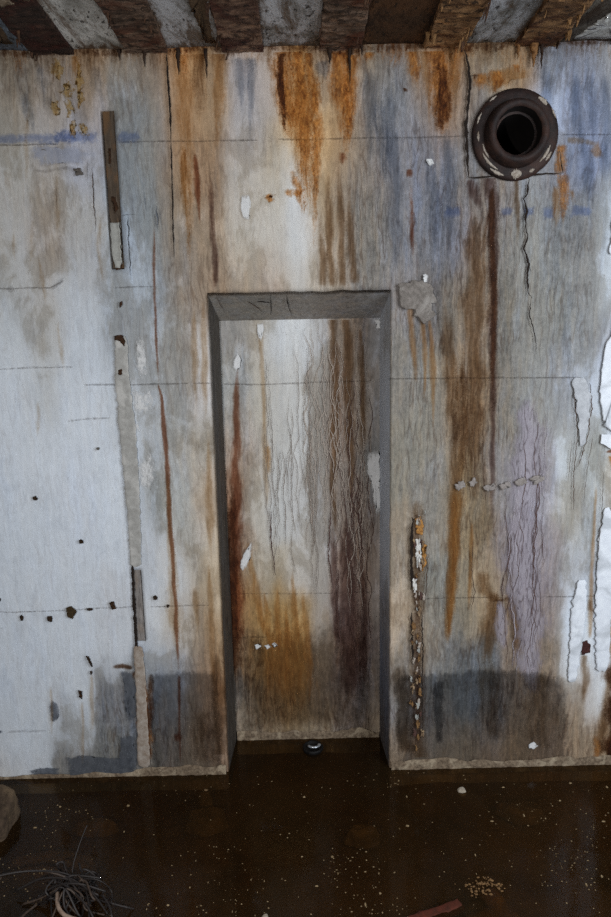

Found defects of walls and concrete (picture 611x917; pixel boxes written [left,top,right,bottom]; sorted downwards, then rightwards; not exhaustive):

corrosion [271,46,285,112]
crack [464,50,495,178]
crack [522,151,563,343]
peeling [572,337,611,472]
spalling [409,510,429,751]
peeling [568,507,611,682]
damp [391,755,611,770]